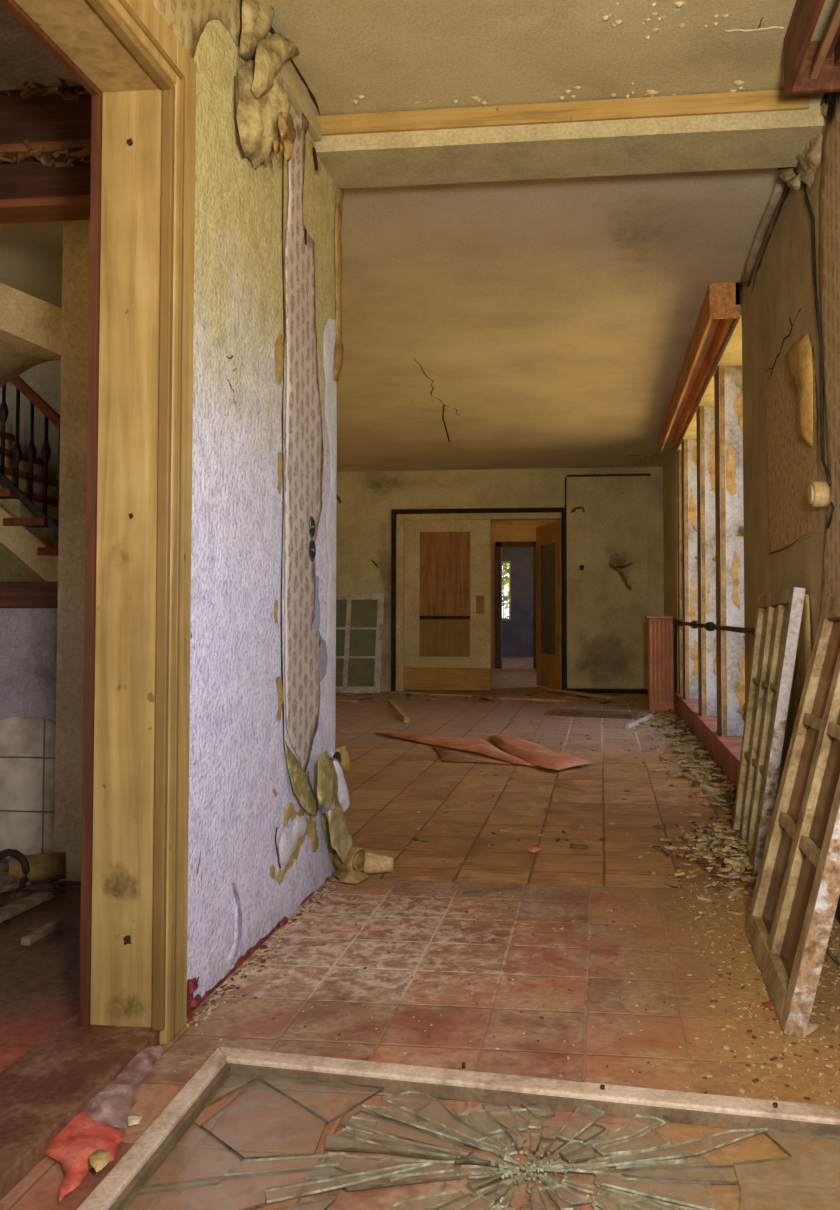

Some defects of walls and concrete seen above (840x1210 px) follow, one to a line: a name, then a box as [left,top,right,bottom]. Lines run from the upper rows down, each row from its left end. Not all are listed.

peeling [641,0,731,40]
water stain [824,92,840,124]
spalling [310,141,321,176]
crack [765,308,802,382]
crack [413,357,460,416]
spalling [314,318,337,742]
peeling [270,802,318,886]